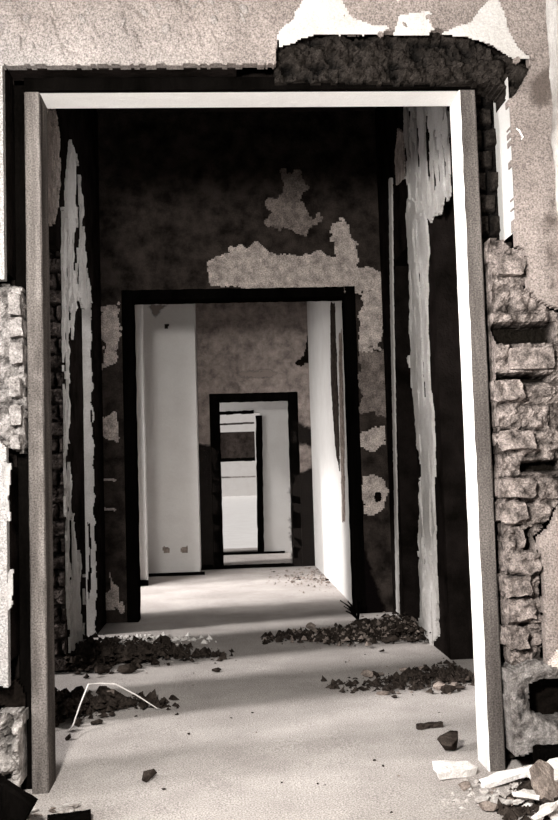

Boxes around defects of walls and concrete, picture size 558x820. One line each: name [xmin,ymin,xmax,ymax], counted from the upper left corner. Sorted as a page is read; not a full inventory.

flaking render [273,0,535,113]
spalling [0,284,28,454]
flaking render [47,109,125,671]
flaking render [207,106,452,646]
peeling [2,461,12,521]
spalling [482,238,558,757]
spalling [0,675,29,787]